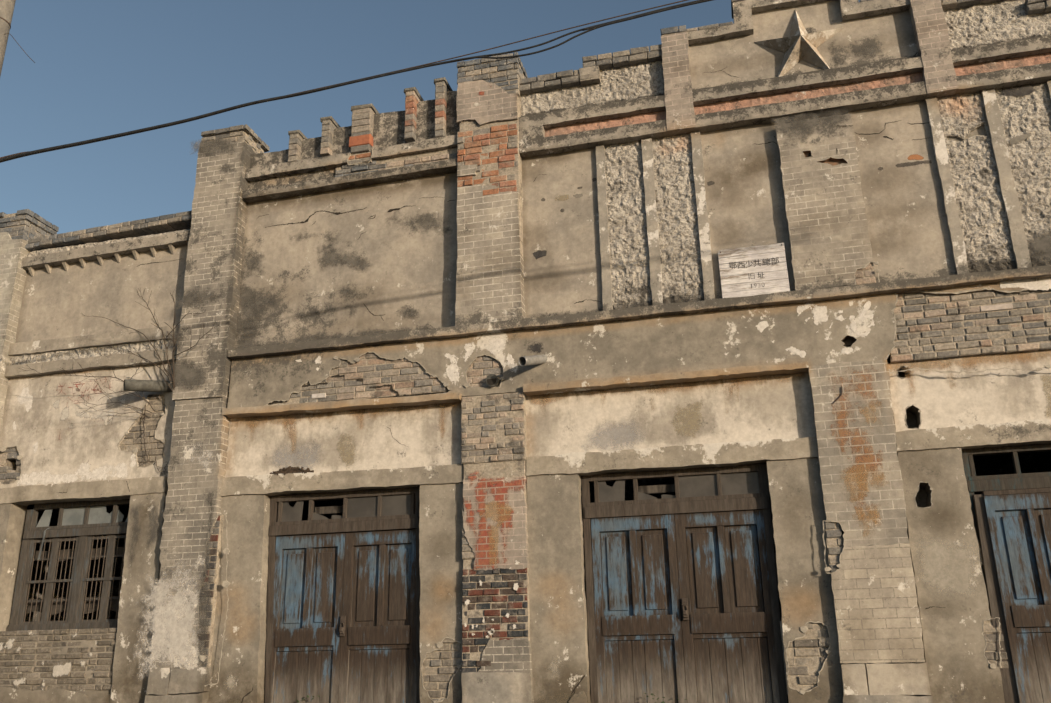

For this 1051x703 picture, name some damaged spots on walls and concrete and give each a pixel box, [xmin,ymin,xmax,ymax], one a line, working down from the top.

damp [318,236,370,270]
crack [262,197,454,238]
damp [238,248,273,348]
damp [356,307,428,336]
flaking render [884,277,1051,379]
peeling [16,386,44,412]
flaking render [264,337,526,464]
flaking render [0,394,166,487]
flaking render [823,521,846,574]
flaking render [421,504,530,703]
flaking render [780,621,831,695]
flaking render [982,616,1009,669]